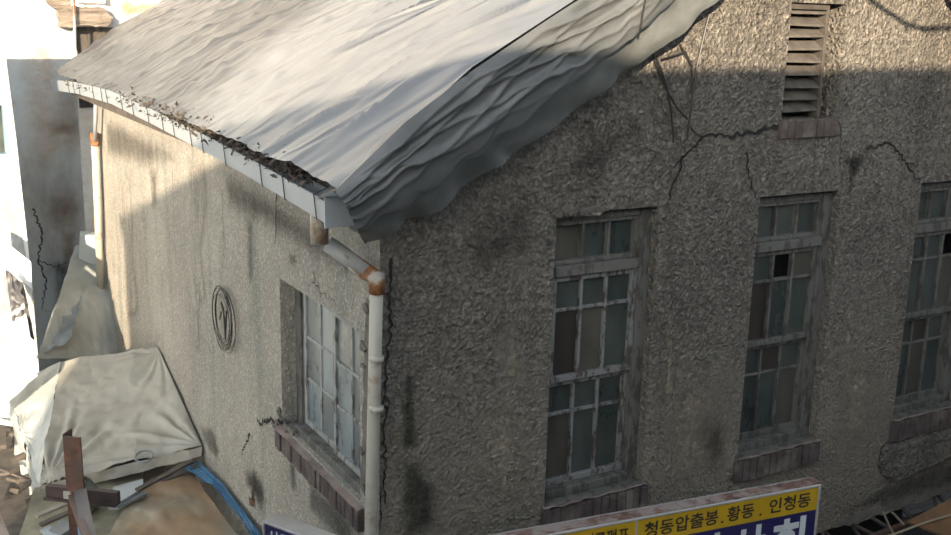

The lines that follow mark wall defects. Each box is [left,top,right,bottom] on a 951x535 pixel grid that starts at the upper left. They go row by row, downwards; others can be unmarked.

spalling [45,0,71,12]
crack [654,92,779,207]
crack [866,141,921,184]
crack [32,208,68,311]
damp [249,474,262,502]